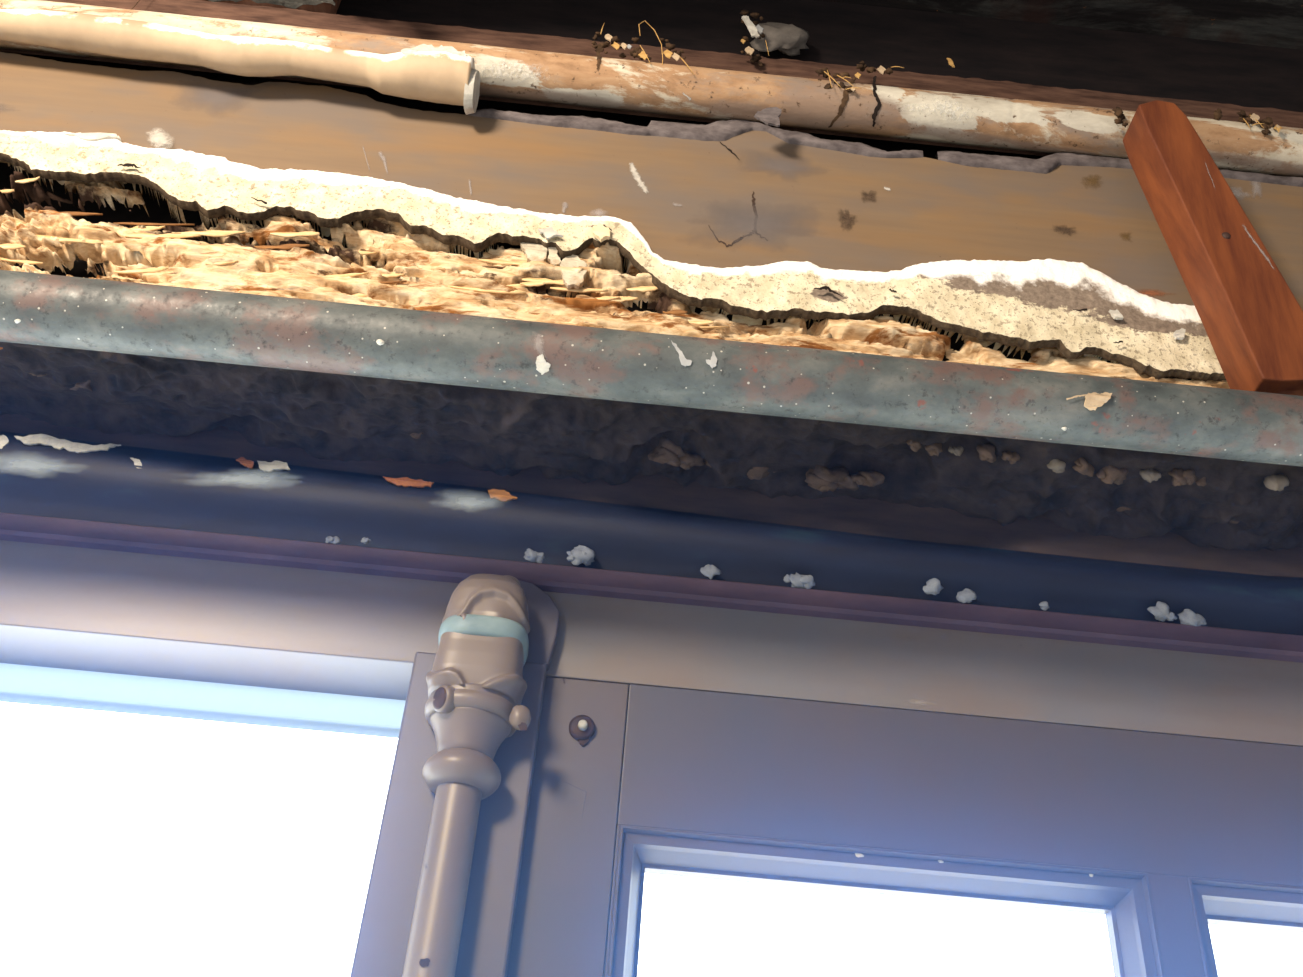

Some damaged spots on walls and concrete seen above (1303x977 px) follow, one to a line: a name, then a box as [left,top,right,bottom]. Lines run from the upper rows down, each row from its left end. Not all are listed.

peeling [209,0,335,9]
crack [872,76,882,127]
crack [708,192,768,247]
spalling [0,130,1226,382]
spalling [0,342,1303,551]